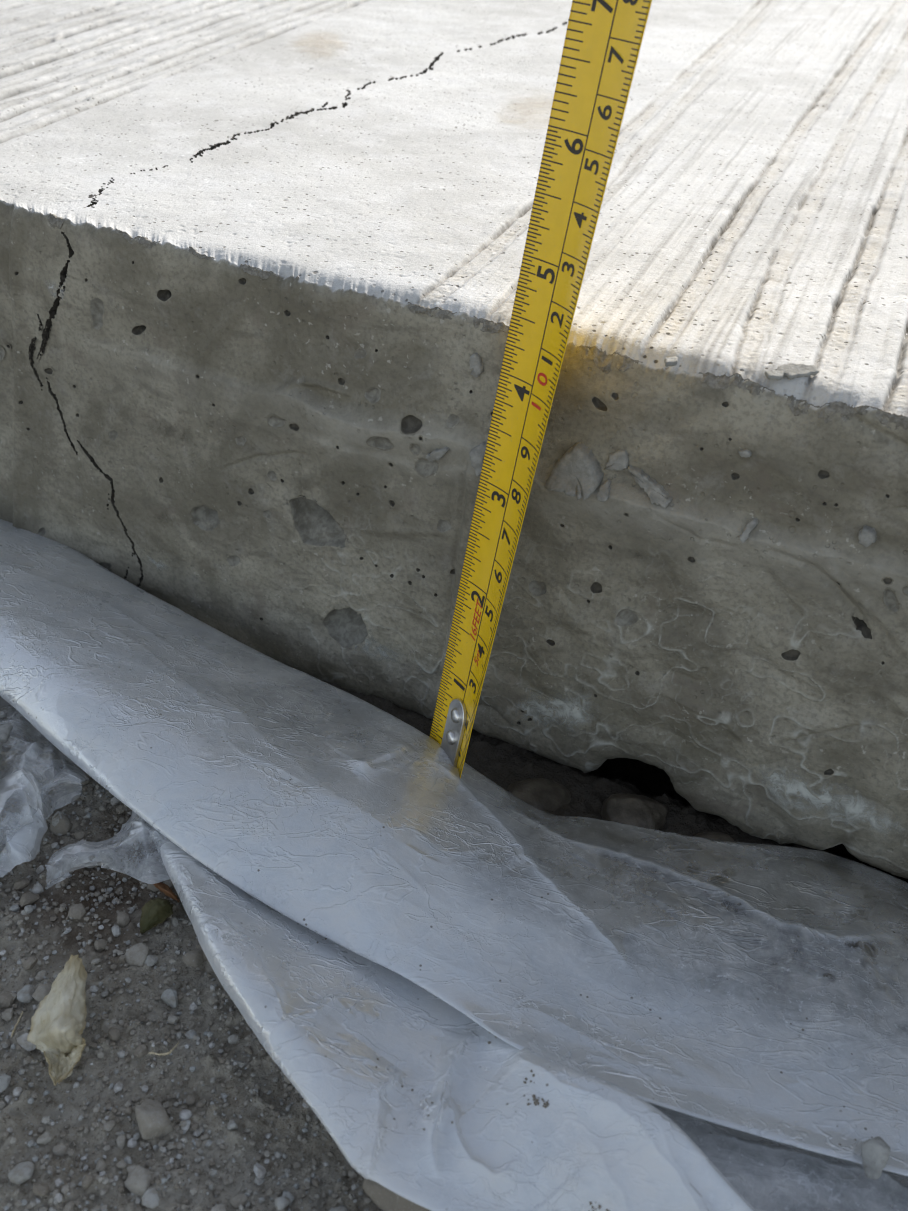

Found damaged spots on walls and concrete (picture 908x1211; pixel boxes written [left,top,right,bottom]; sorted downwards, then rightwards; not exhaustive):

crack [87,22,568,208]
crack [28,232,144,587]